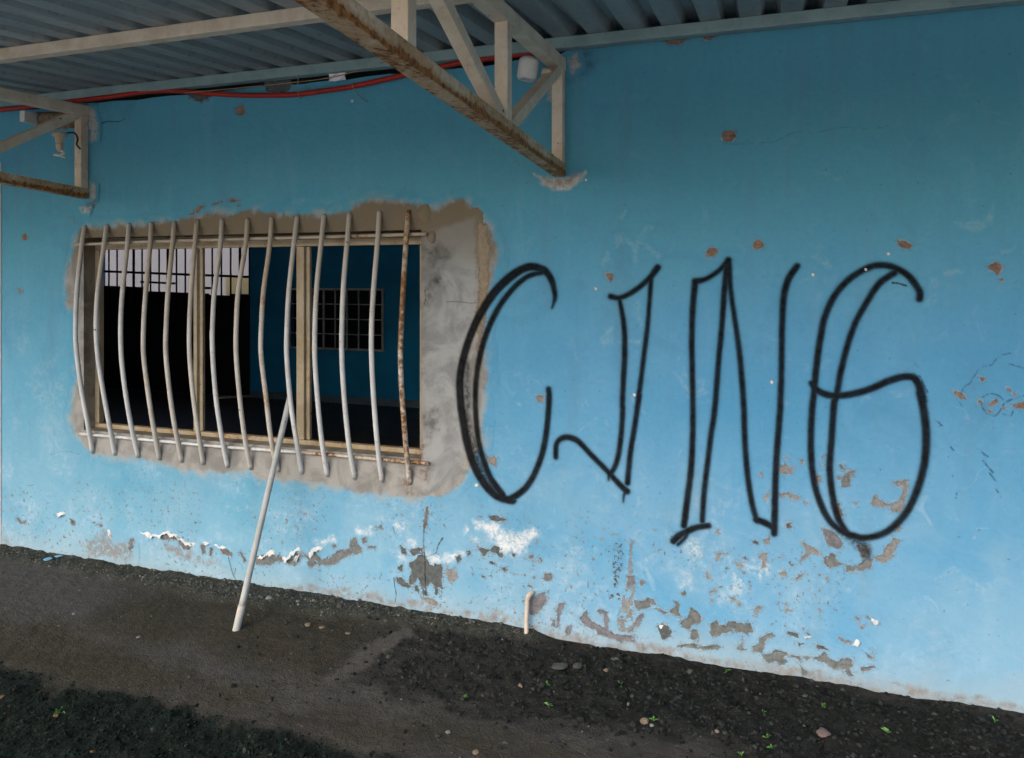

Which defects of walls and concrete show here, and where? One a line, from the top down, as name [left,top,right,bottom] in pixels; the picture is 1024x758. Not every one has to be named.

spalling [722,130,736,143]
spalling [987,262,1004,281]
peeling [779,456,804,475]
peeling [837,464,856,487]
peeling [763,492,809,505]
peeling [870,479,909,513]
peeling [128,524,384,568]
crack [423,506,443,594]
peeling [715,526,902,582]
peeling [396,545,515,608]
peeling [527,540,880,677]